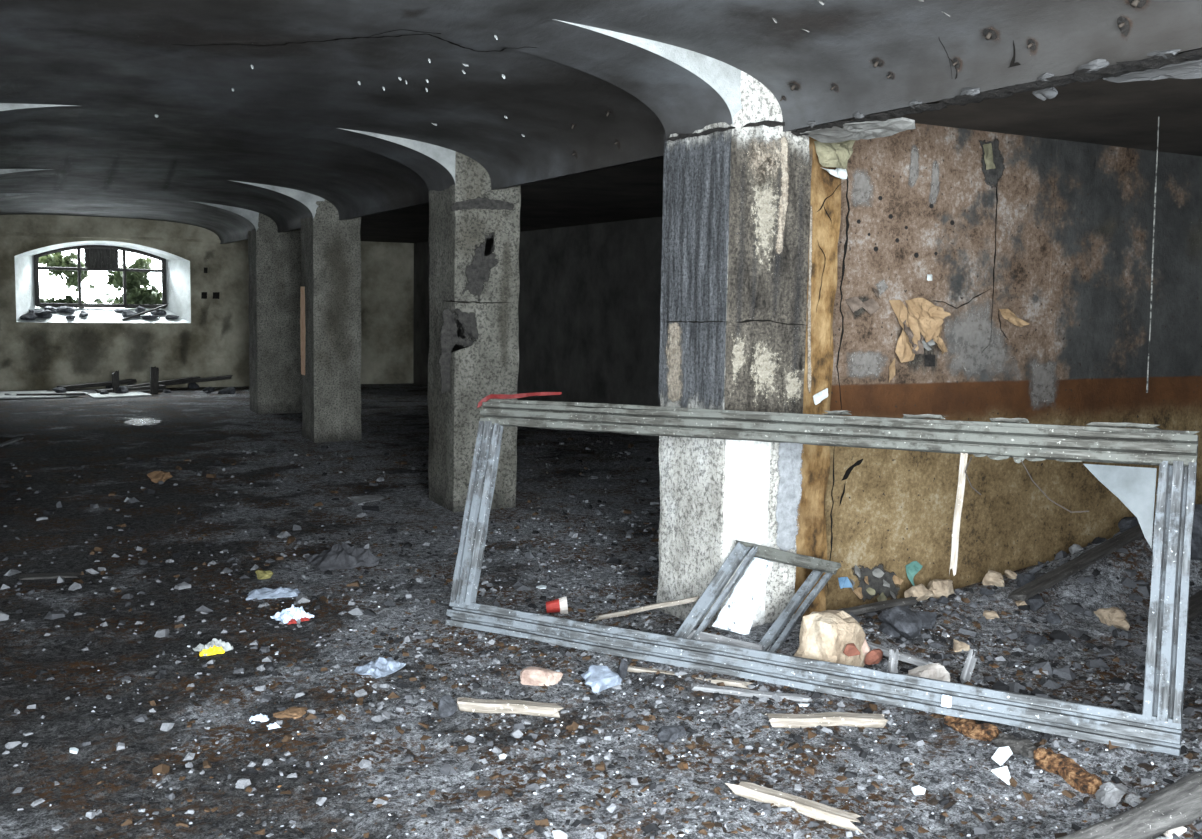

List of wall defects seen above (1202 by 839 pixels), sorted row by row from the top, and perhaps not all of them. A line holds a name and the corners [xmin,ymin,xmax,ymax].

spalling [665,48,1202,271]
spalling [439,232,499,397]
crack [669,177,850,411]
peeling [730,206,828,410]
crack [827,446,863,588]